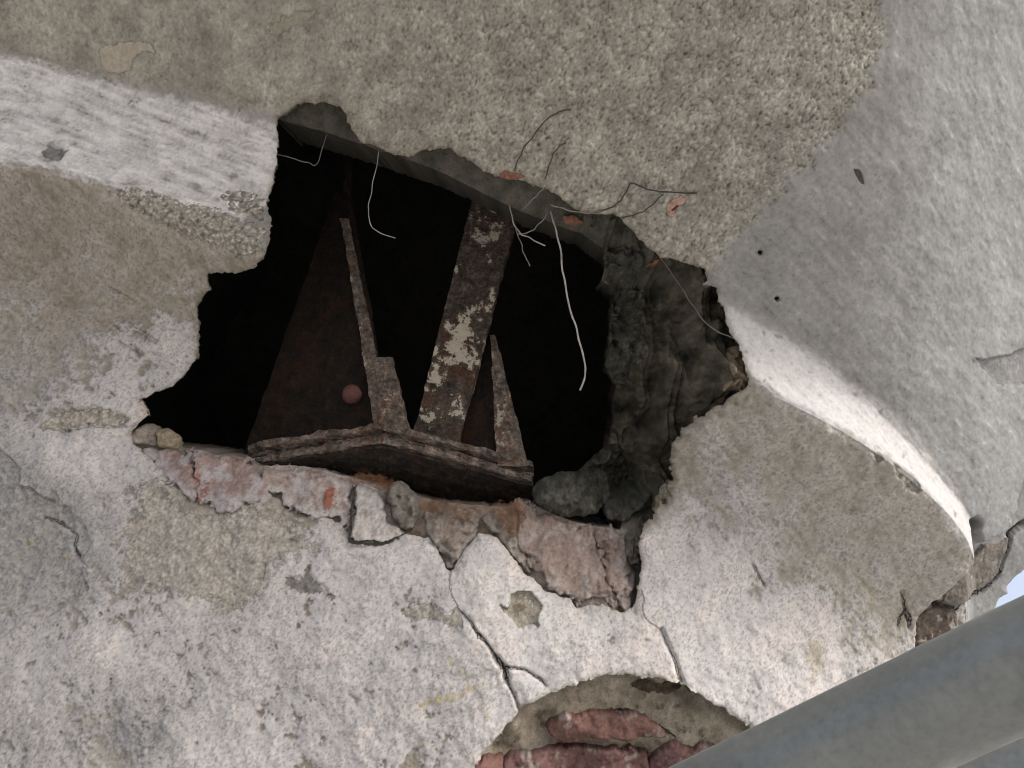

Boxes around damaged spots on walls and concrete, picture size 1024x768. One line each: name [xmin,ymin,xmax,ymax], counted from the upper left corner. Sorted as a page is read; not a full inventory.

spalling [40,101,749,629]
corrosion [325,487,341,513]
corrosion [354,474,394,491]
crack [348,485,400,546]
corrosion [248,423,534,484]
crack [449,571,546,707]
spalling [915,538,1008,647]
peeling [474,674,750,768]